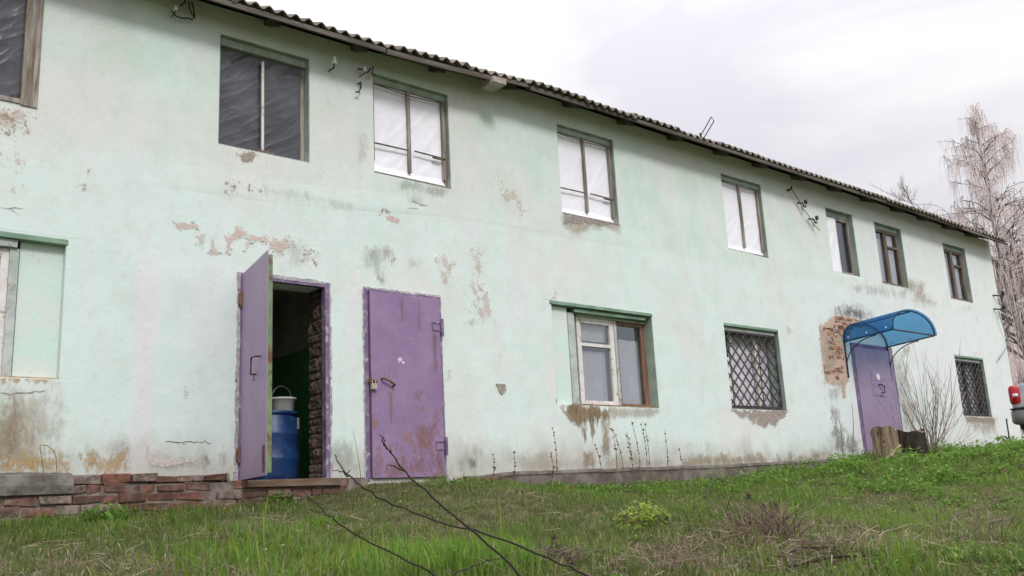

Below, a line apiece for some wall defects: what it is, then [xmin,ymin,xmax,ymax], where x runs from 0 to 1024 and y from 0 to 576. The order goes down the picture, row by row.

peeling [0,108,37,141]
peeling [172,220,319,266]
peeling [470,248,492,324]
flaking render [818,316,865,398]
damp [0,398,45,456]